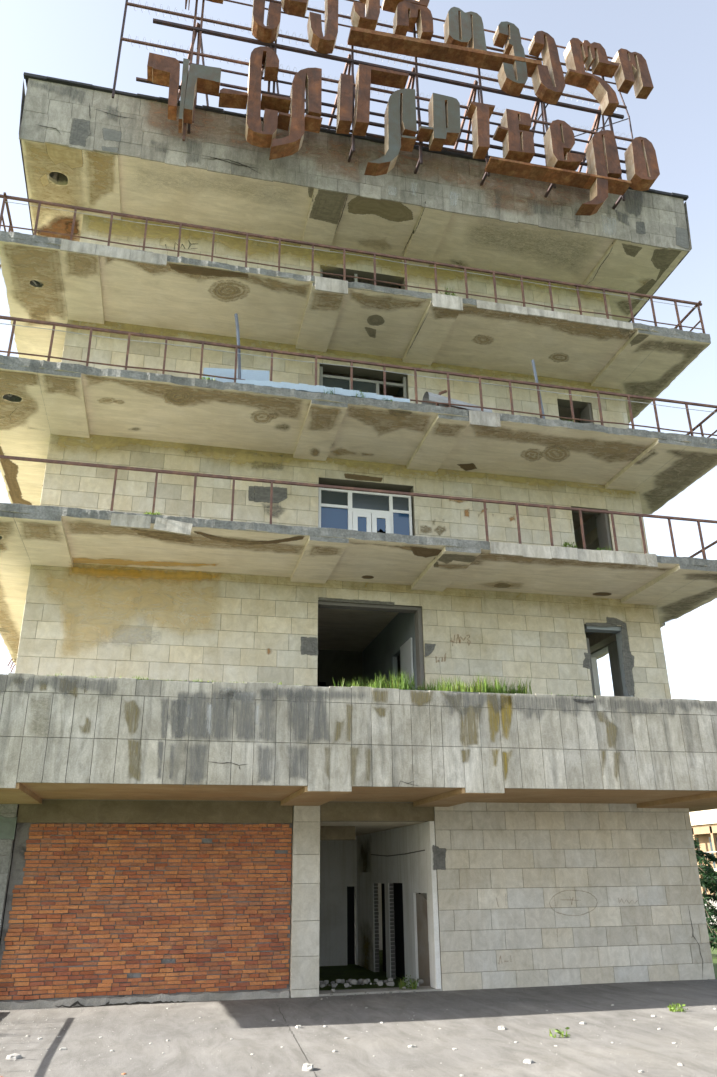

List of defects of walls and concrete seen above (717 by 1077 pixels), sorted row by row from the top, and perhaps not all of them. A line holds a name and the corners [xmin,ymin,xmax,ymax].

damp [5,245,633,339]
damp [88,215,603,298]
damp [74,321,704,414]
damp [0,370,655,464]
peeling [0,446,32,505]
damp [58,428,717,509]
damp [72,558,215,581]
damp [70,523,298,553]
spalling [583,653,592,669]
spalling [585,617,635,696]
damp [158,688,387,784]
damp [411,691,654,779]